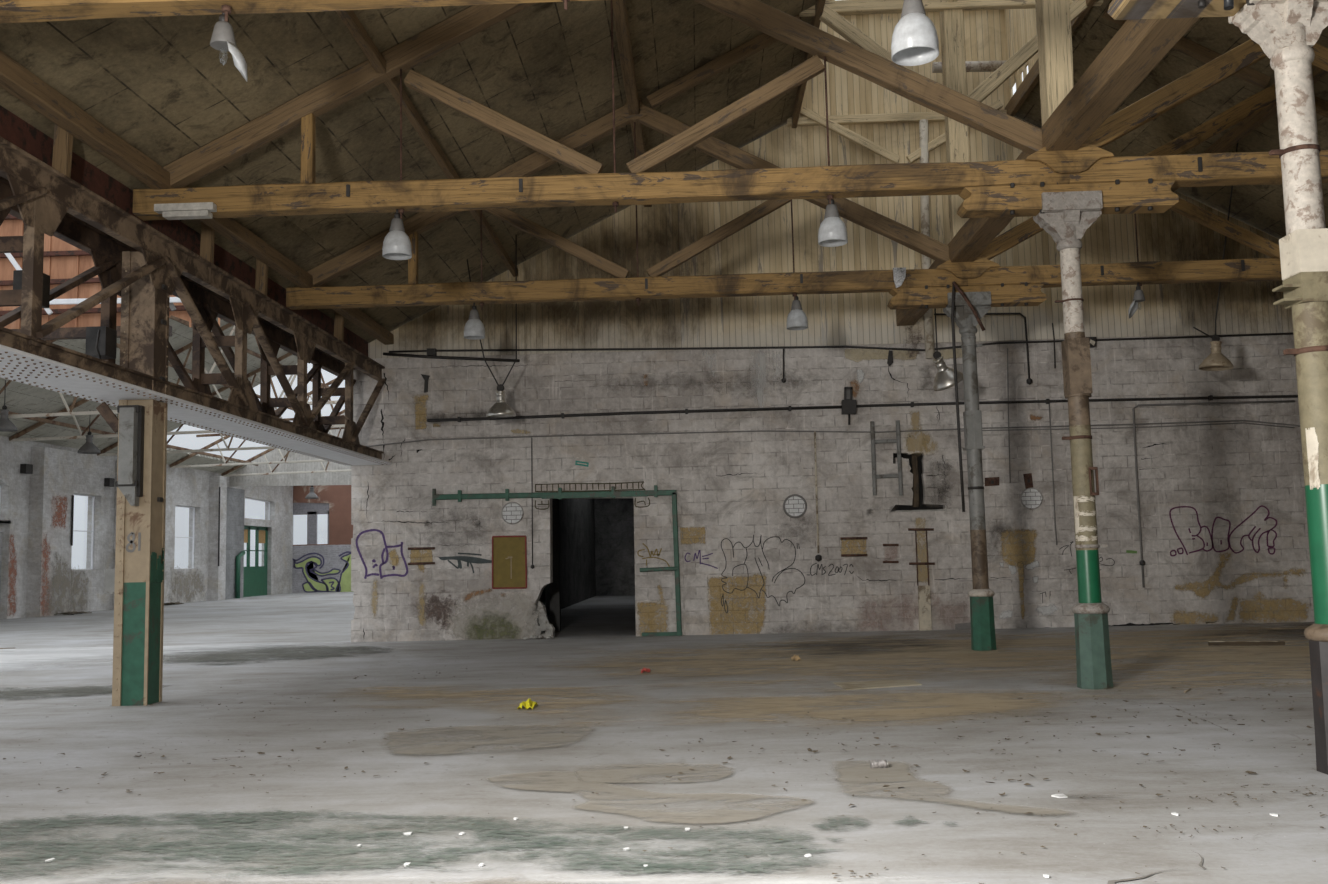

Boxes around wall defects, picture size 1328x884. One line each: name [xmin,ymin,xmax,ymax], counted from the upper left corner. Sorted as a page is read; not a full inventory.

peeling [1305,427,1320,490]
peeling [1073,496,1098,541]
flaking render [7,536,17,615]
flaking render [40,497,67,616]
crack [1107,850,1206,884]